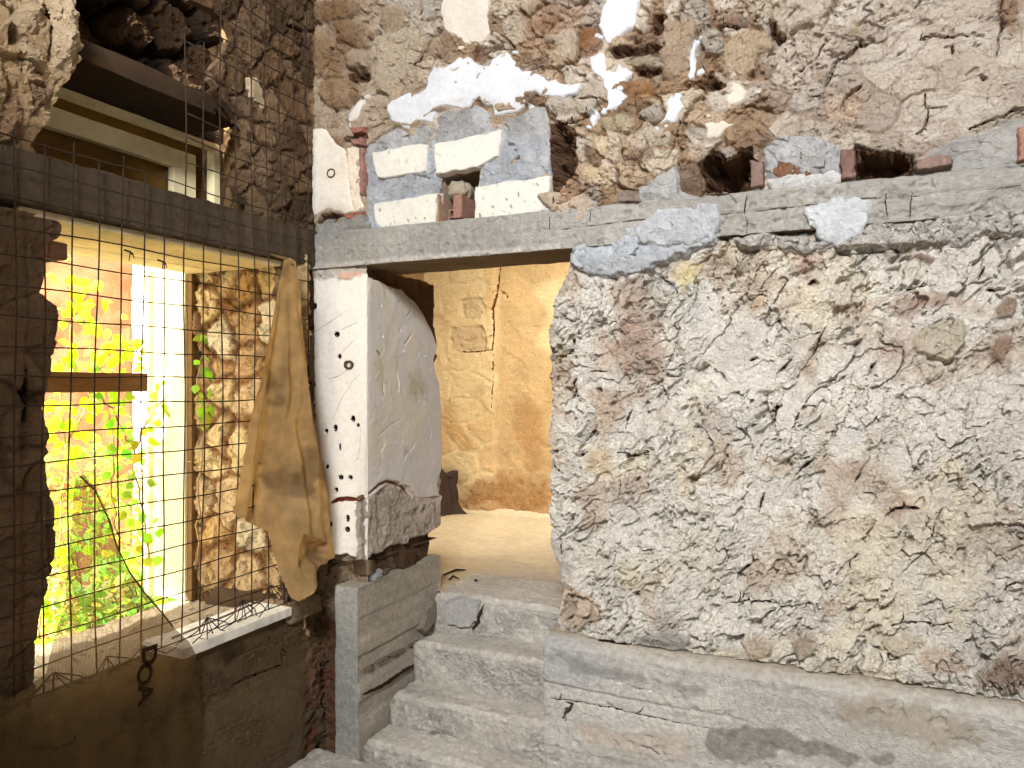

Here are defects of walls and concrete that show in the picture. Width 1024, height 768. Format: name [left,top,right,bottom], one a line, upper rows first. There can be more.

flaking render [387,0,581,129]
spalling [549,0,667,203]
flaking render [312,73,371,224]
spalling [699,114,754,194]
spalling [855,149,912,181]
crack [463,267,509,408]
spalling [354,486,441,560]
crack [886,501,942,542]
crack [731,554,820,607]
crack [597,639,653,647]
crack [891,613,960,632]
crack [551,693,713,729]